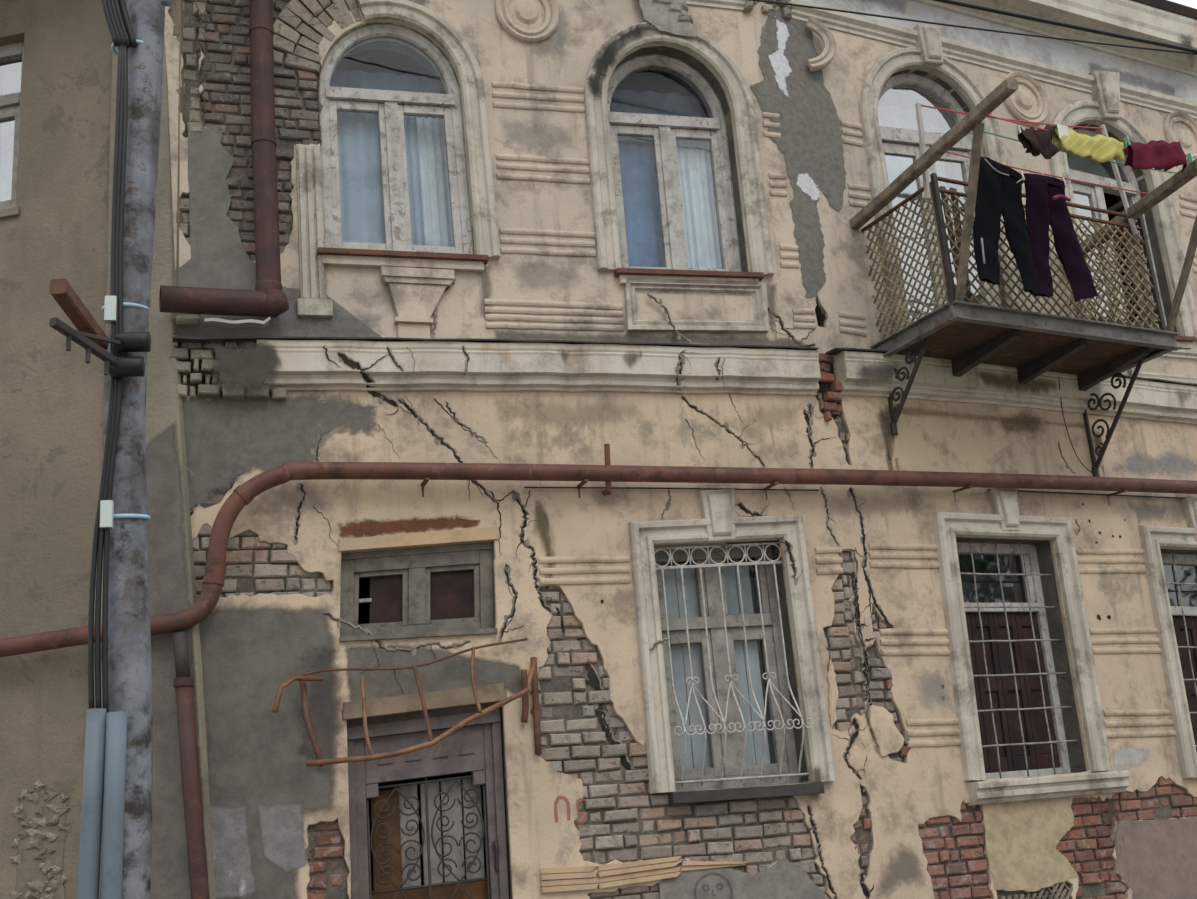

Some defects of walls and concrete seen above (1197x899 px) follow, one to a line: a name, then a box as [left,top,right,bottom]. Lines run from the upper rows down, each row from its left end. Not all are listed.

flaking render [168,0,256,261]
flaking render [273,0,362,254]
leakage [588,23,651,97]
flaking render [220,530,333,598]
crack [288,273,635,770]
flaking render [529,586,830,899]
crack [647,293,803,586]
crack [759,281,816,347]
crack [805,805,874,899]
crack [803,403,895,780]
flaking render [823,548,911,763]
flaking render [918,777,1197,899]